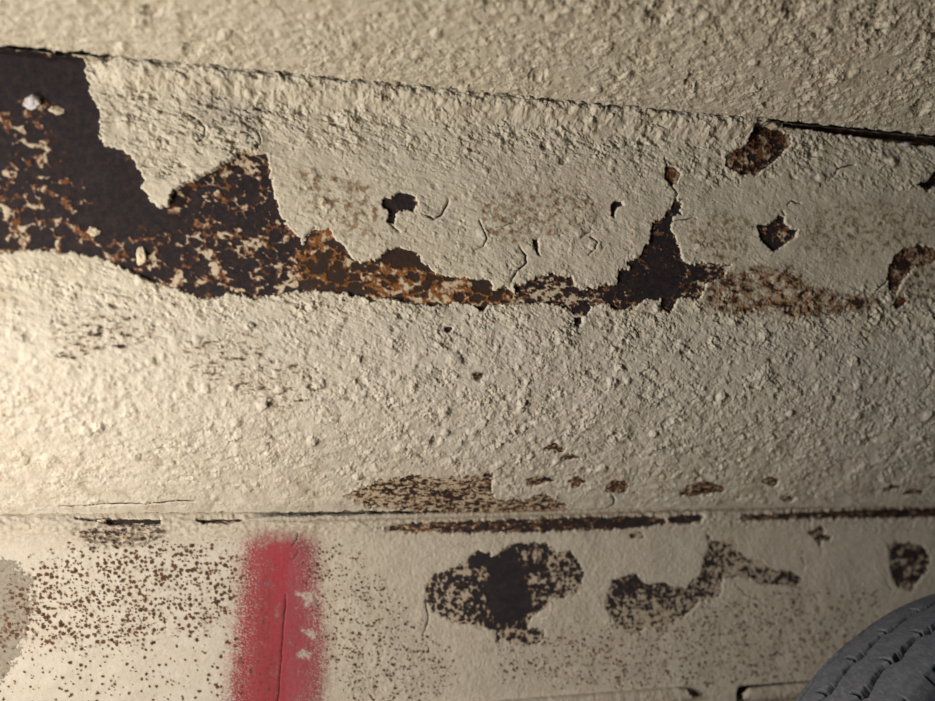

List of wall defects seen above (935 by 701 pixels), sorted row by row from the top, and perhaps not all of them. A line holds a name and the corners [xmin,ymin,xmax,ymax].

peeling [0,47,302,300]
rust [299,170,380,236]
rust [293,227,516,308]
rust [480,189,597,242]
peeling [512,198,731,316]
rust [687,214,876,318]
peeling [918,172,935,190]
rust [344,471,667,539]
peeling [0,557,38,684]
peeling [425,542,584,646]
peeling [604,534,802,634]
peeling [887,540,930,593]